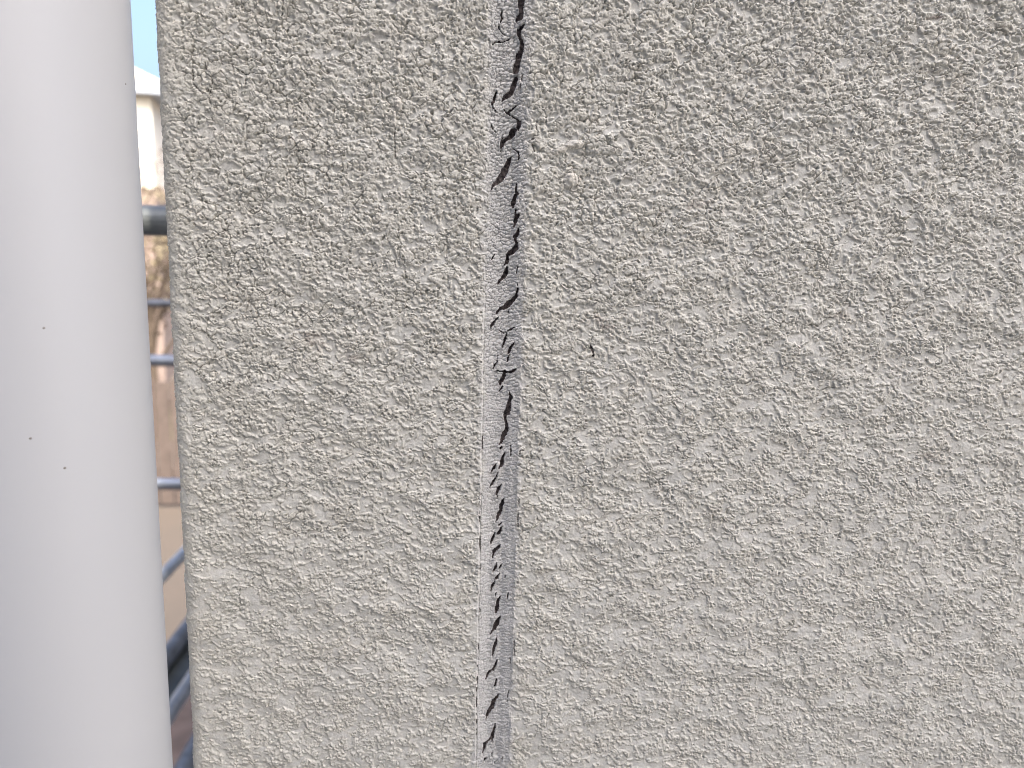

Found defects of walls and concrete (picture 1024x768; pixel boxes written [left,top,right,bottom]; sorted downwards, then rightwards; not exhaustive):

crack [476,0,538,760]